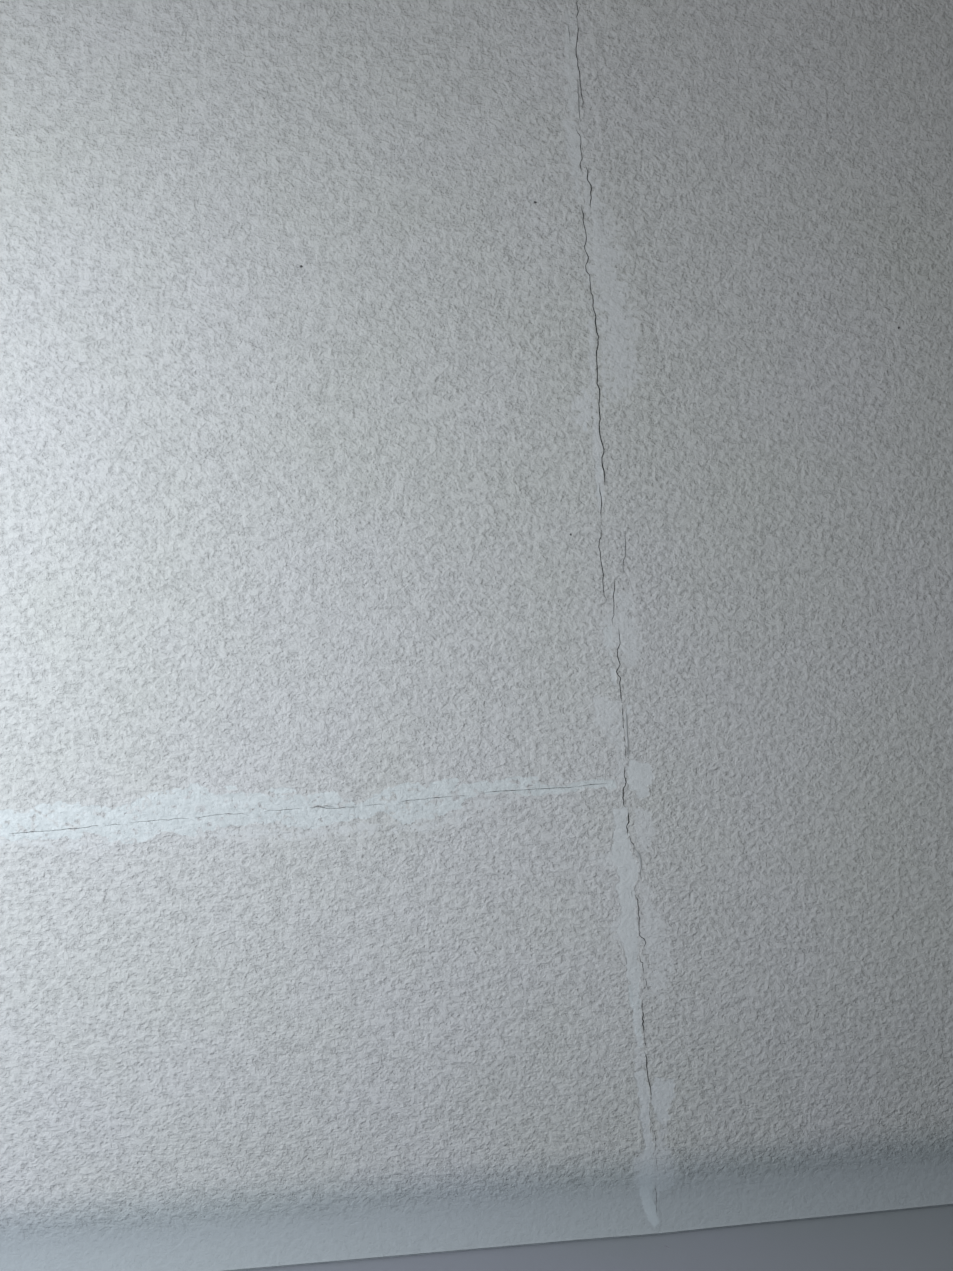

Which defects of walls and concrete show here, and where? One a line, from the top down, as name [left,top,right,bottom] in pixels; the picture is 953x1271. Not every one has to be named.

crack [11,2,658,1212]